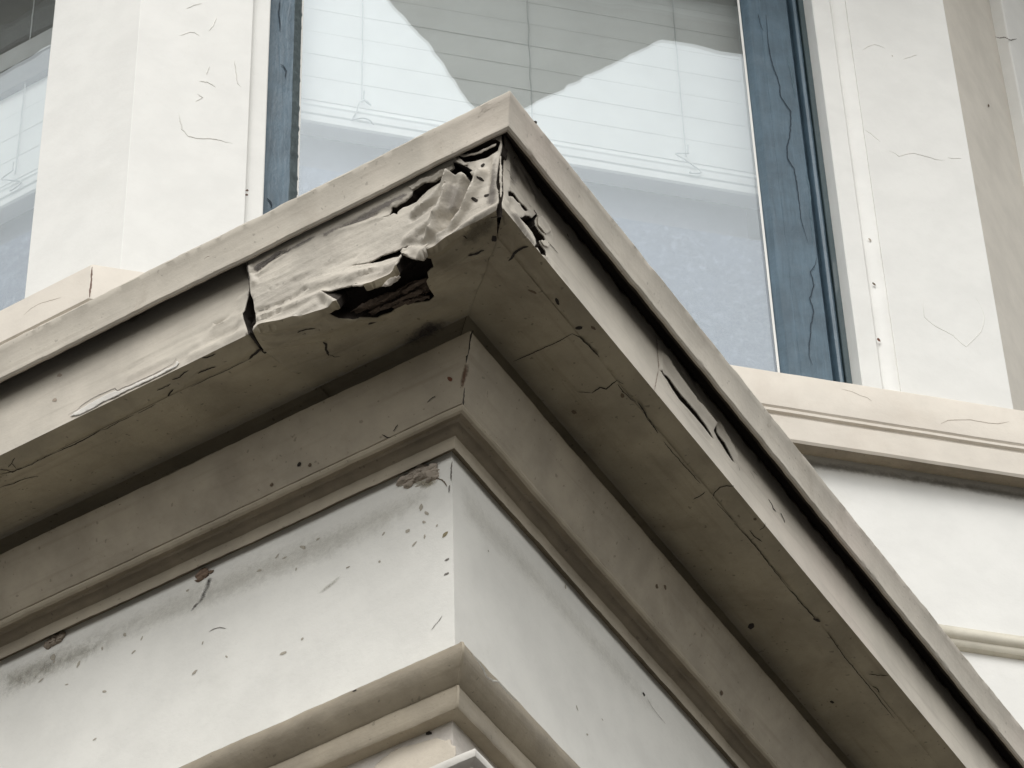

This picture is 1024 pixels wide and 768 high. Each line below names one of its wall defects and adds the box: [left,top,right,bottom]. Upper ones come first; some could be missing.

crack [182,3,217,36]
crack [179,61,241,143]
crack [864,129,961,160]
peeling [409,144,503,202]
peeling [400,244,429,261]
peeling [537,216,552,247]
peeling [70,361,179,417]
crack [0,309,271,488]
crack [584,380,894,718]